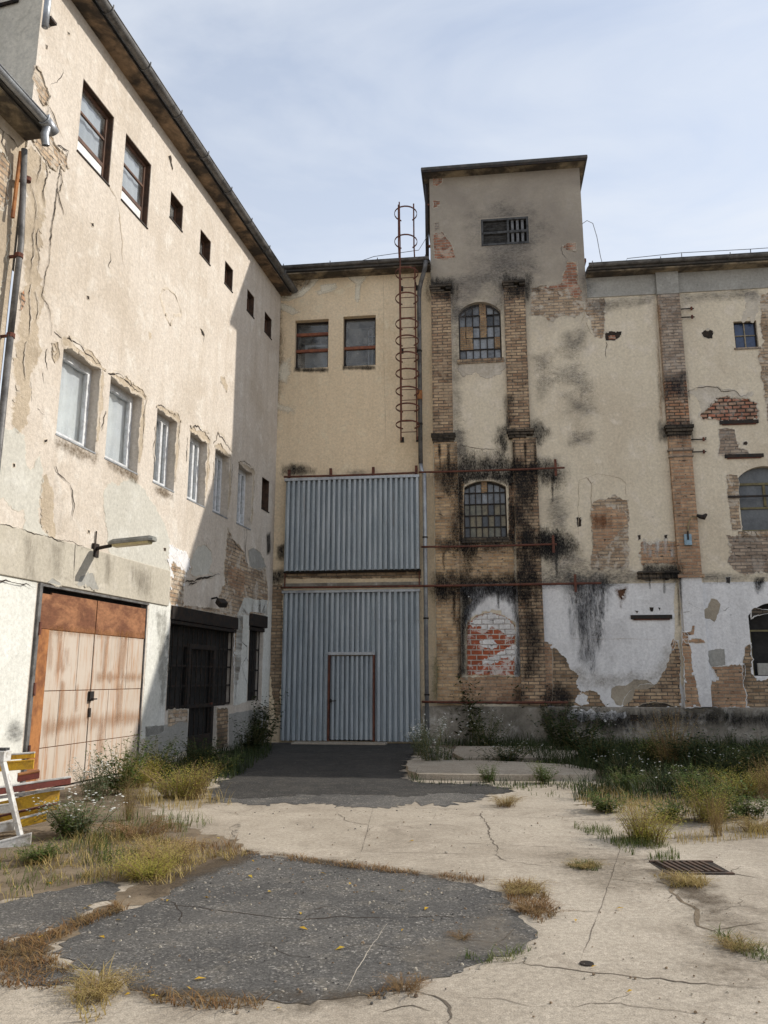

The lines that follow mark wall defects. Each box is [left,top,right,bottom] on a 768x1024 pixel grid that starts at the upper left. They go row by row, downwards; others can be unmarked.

flaking render [0,137,255,496]
crack [23,74,255,502]
flaking render [529,242,622,341]
flaking render [687,291,768,456]
flaking render [576,494,677,571]
flaking render [725,474,768,584]
flaking render [163,527,422,749]
damp [434,587,469,673]
damp [516,548,540,678]
damp [571,581,608,664]
peeling [539,579,768,723]
crack [337,807,768,988]